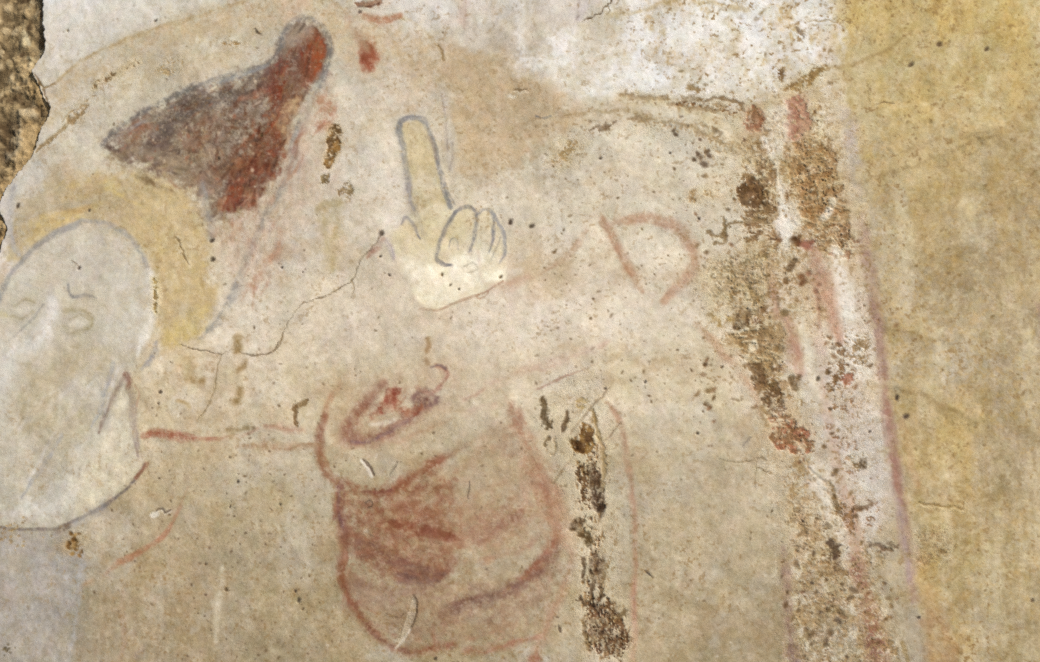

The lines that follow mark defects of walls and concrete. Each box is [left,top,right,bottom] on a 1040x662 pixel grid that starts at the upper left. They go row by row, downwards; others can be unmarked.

crack [582,0,620,22]
crack [180,236,380,423]
flaking render [539,59,958,662]